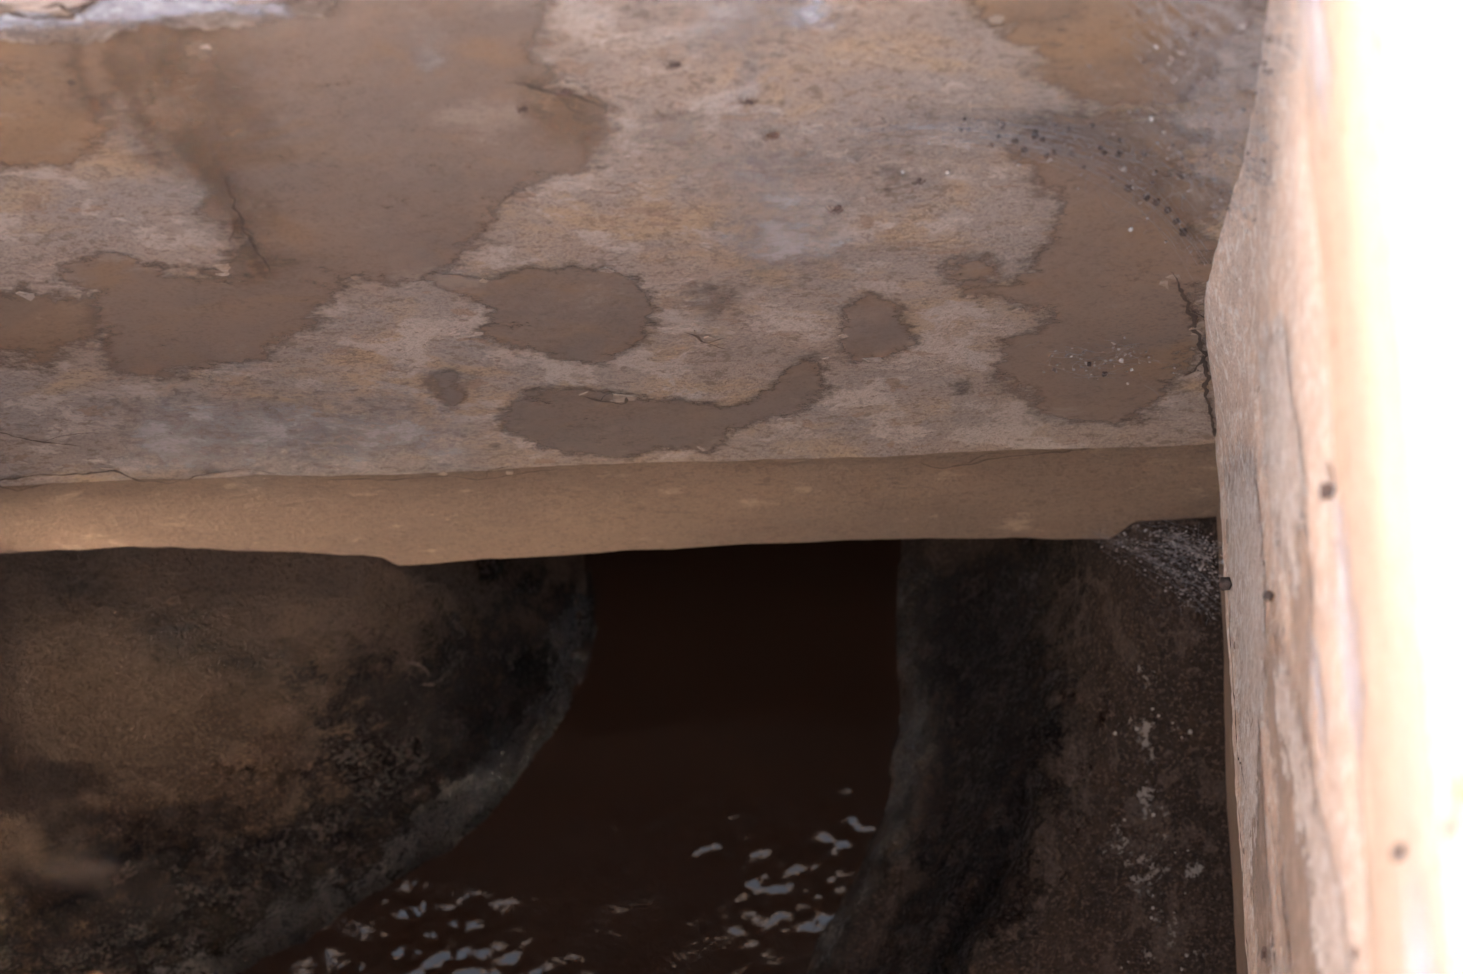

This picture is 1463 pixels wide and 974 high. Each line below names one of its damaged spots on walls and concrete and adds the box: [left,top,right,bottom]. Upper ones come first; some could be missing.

leakage [0,0,289,216]
crack [1159,274,1217,437]
leakage [0,558,597,974]
leakage [857,538,1098,974]